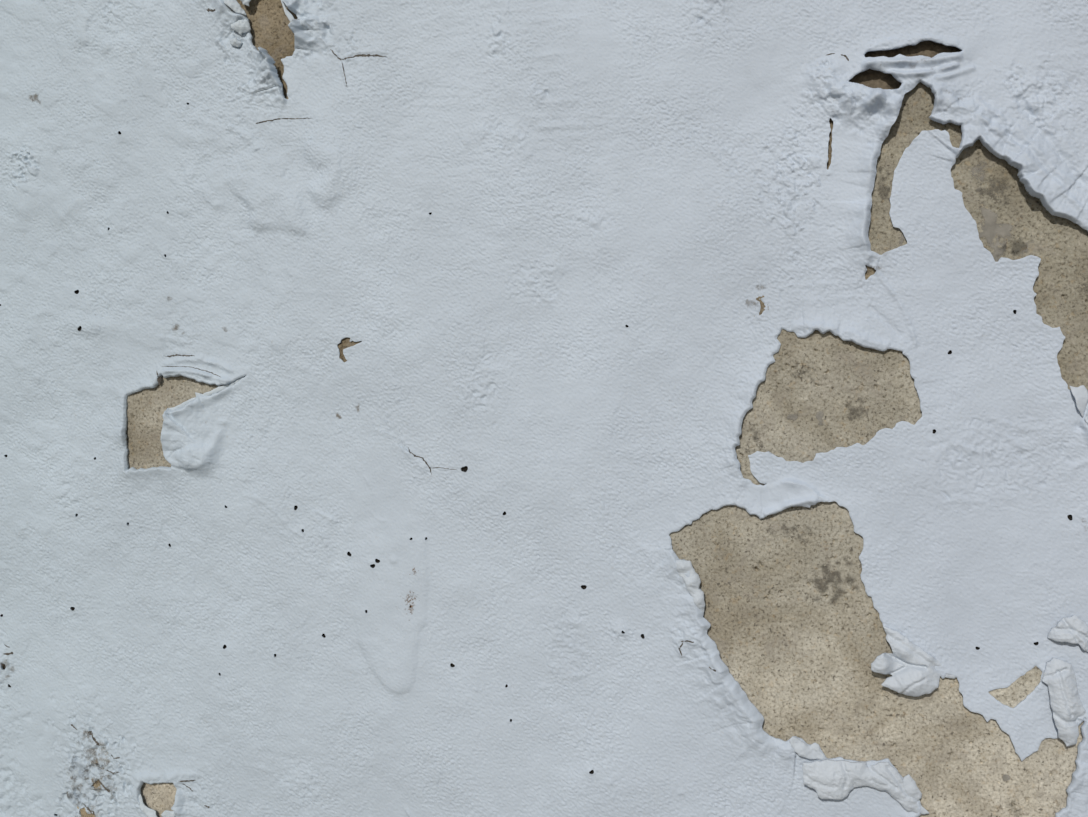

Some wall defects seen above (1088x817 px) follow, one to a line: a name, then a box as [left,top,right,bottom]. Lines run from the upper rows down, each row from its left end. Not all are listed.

peeling [196,0,324,124]
peeling [842,69,1088,447]
peeling [106,353,268,489]
peeling [638,292,1088,817]
peeling [58,715,189,817]